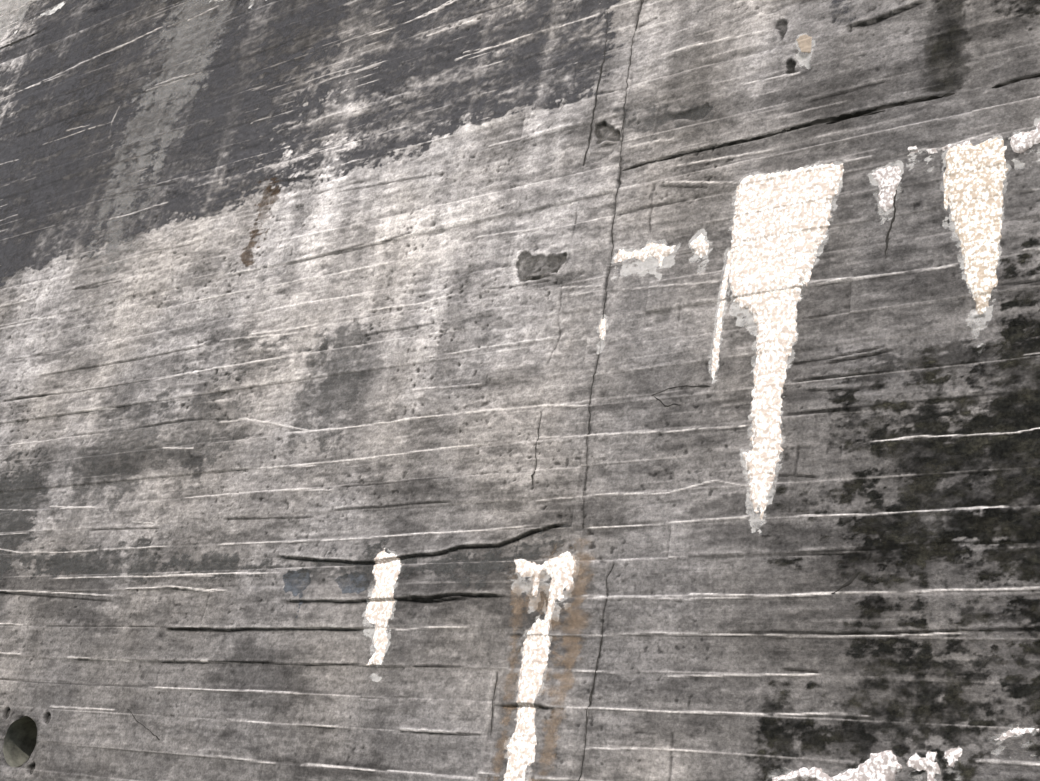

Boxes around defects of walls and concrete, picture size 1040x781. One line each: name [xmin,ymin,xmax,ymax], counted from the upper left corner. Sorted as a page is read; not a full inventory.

water stain [0,0,623,287]
crack [531,411,541,485]
spalling [516,252,567,282]
water stain [613,242,676,267]
water stain [613,105,712,132]
water stain [690,233,709,258]
crack [582,1,955,526]
water stain [711,162,844,519]
water stain [747,121,1040,781]
crack [992,74,1040,88]
water stain [0,451,577,781]
crack [578,564,614,781]